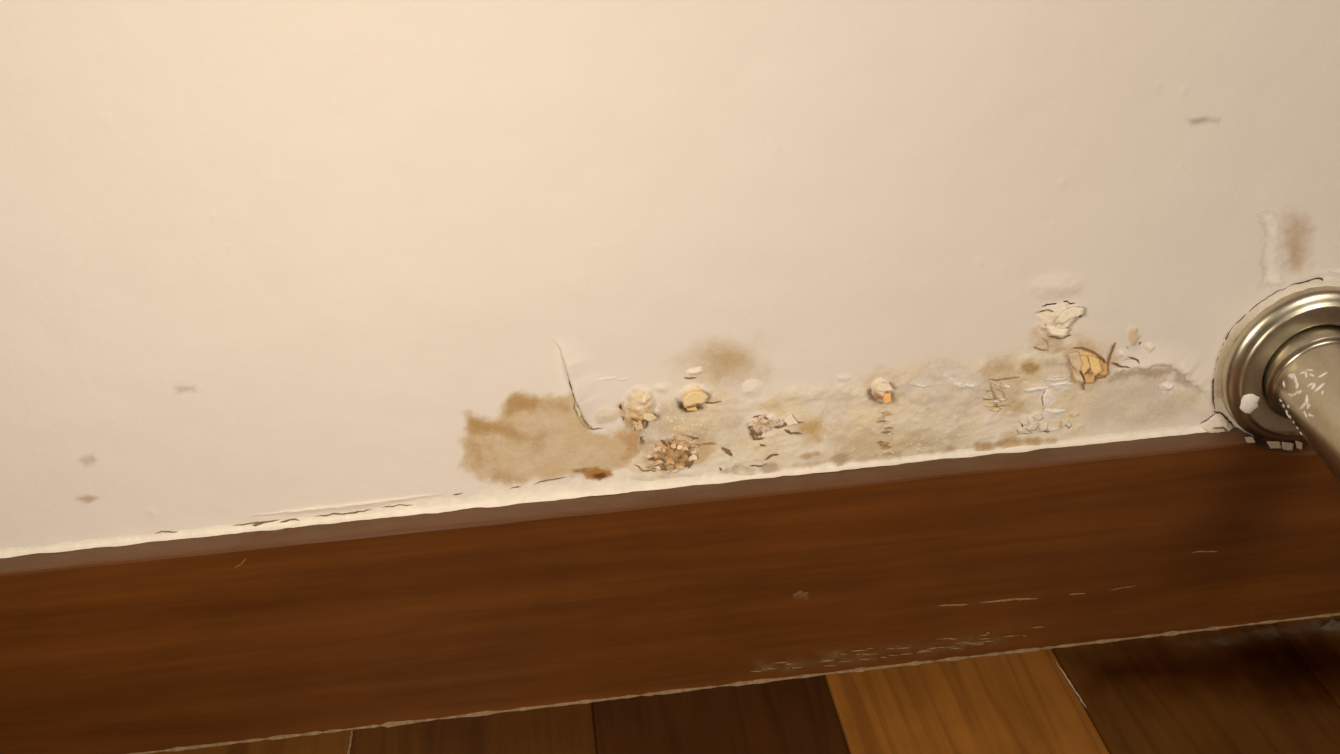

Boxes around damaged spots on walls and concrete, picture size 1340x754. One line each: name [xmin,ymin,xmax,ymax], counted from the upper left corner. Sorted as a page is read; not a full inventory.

crack [551,331,629,430]
spalling [635,431,733,475]
spalling [744,410,803,467]
water stain [465,307,1227,481]
peeling [1017,337,1220,434]